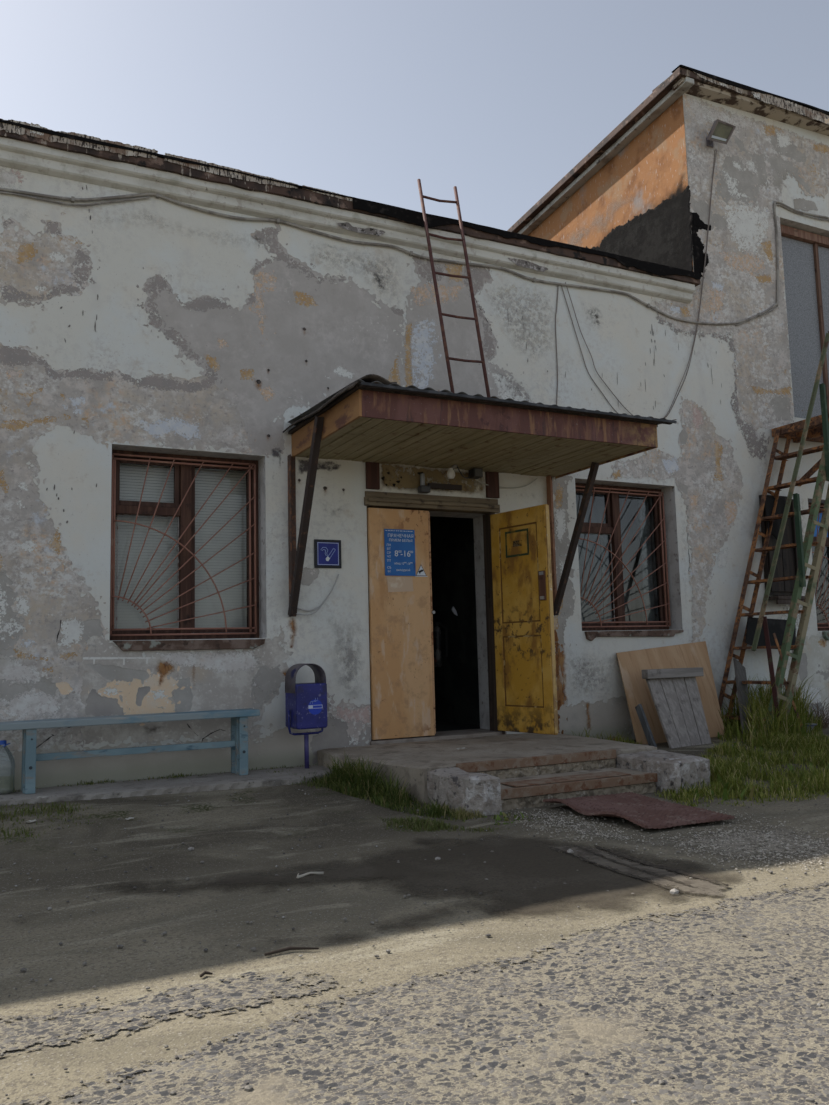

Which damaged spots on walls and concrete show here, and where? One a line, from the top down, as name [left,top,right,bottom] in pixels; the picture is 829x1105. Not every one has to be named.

peeling [0,212,534,753]
rust [554,616,567,734]
peeling [607,94,829,643]
peeling [693,71,829,125]